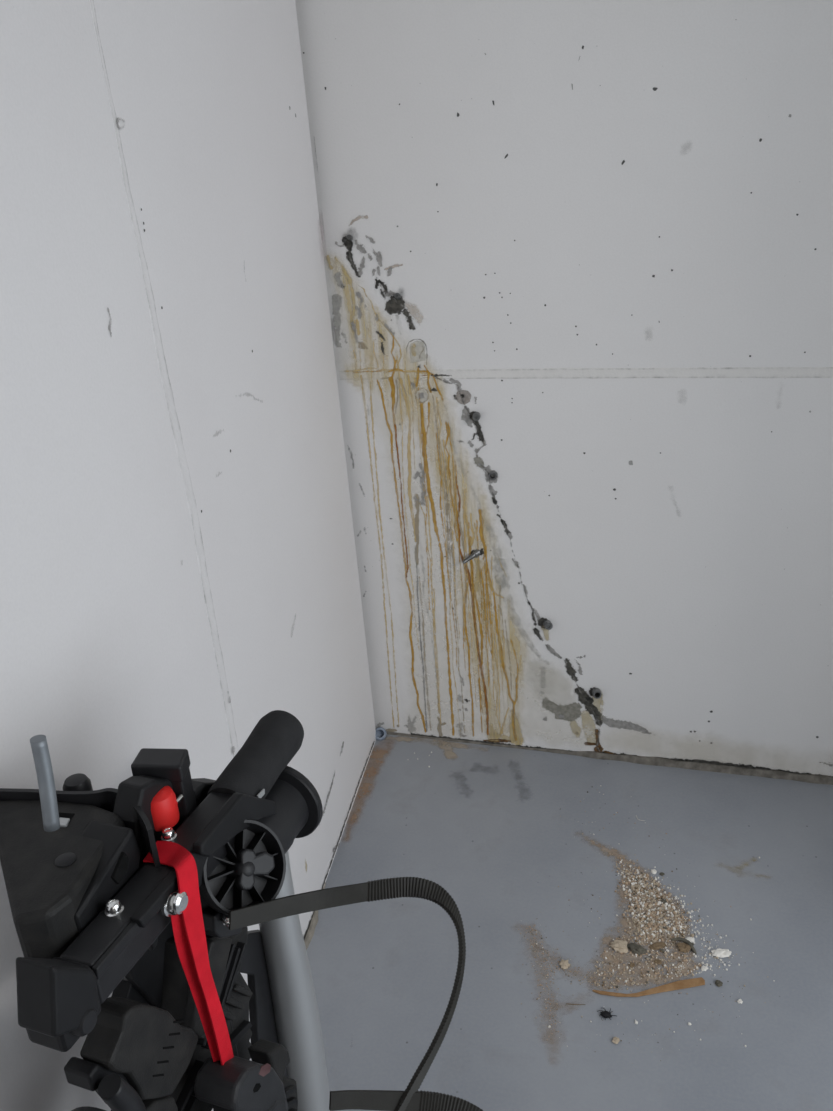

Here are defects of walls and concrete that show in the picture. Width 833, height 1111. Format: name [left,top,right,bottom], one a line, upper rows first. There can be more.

rust [350,594,412,823]
rust [347,332,523,759]
crack [342,236,833,777]